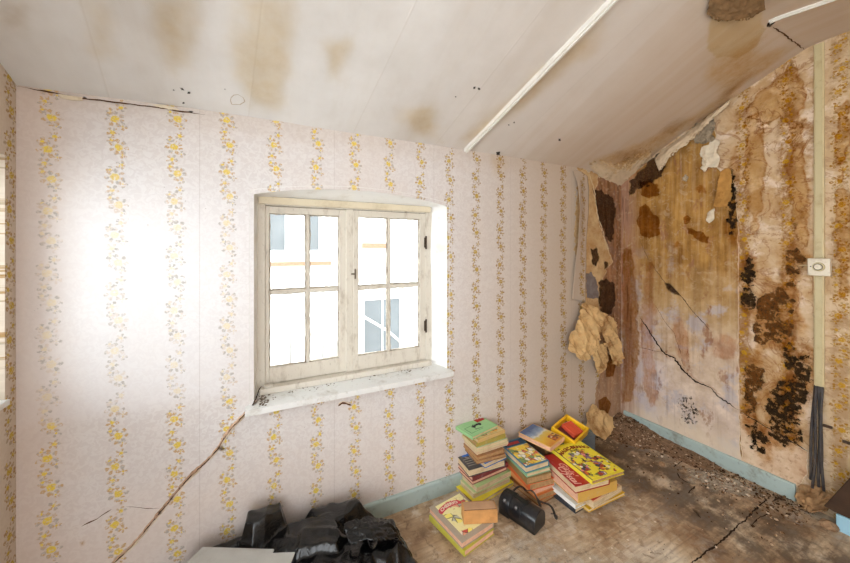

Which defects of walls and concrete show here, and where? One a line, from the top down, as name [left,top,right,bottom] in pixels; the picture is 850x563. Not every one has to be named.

peeling [707,0,766,22]
crack [773,27,804,49]
crack [19,86,205,115]
crack [641,244,710,330]
peeling [568,117,809,487]
crack [640,307,807,451]
leakage [740,238,812,454]
crack [112,386,262,563]
crack [691,492,776,563]